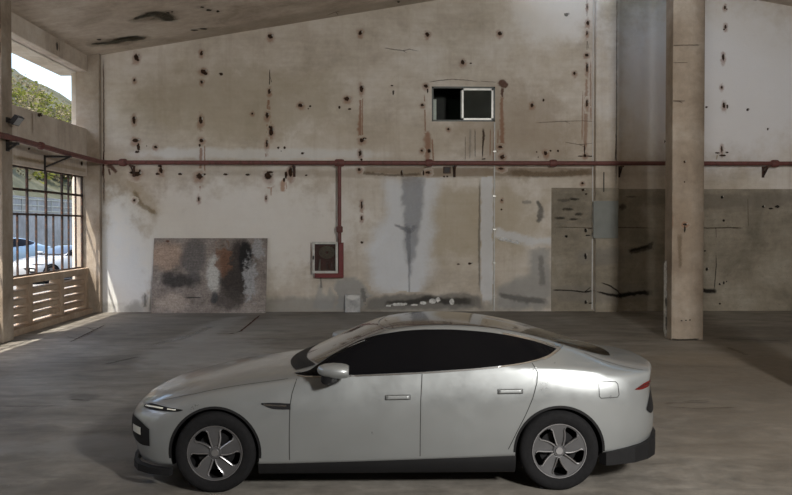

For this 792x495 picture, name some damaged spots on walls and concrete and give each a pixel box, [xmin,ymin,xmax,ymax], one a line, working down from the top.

rust [356,99,364,136]
rust [489,79,509,161]
leakage [312,128,594,312]